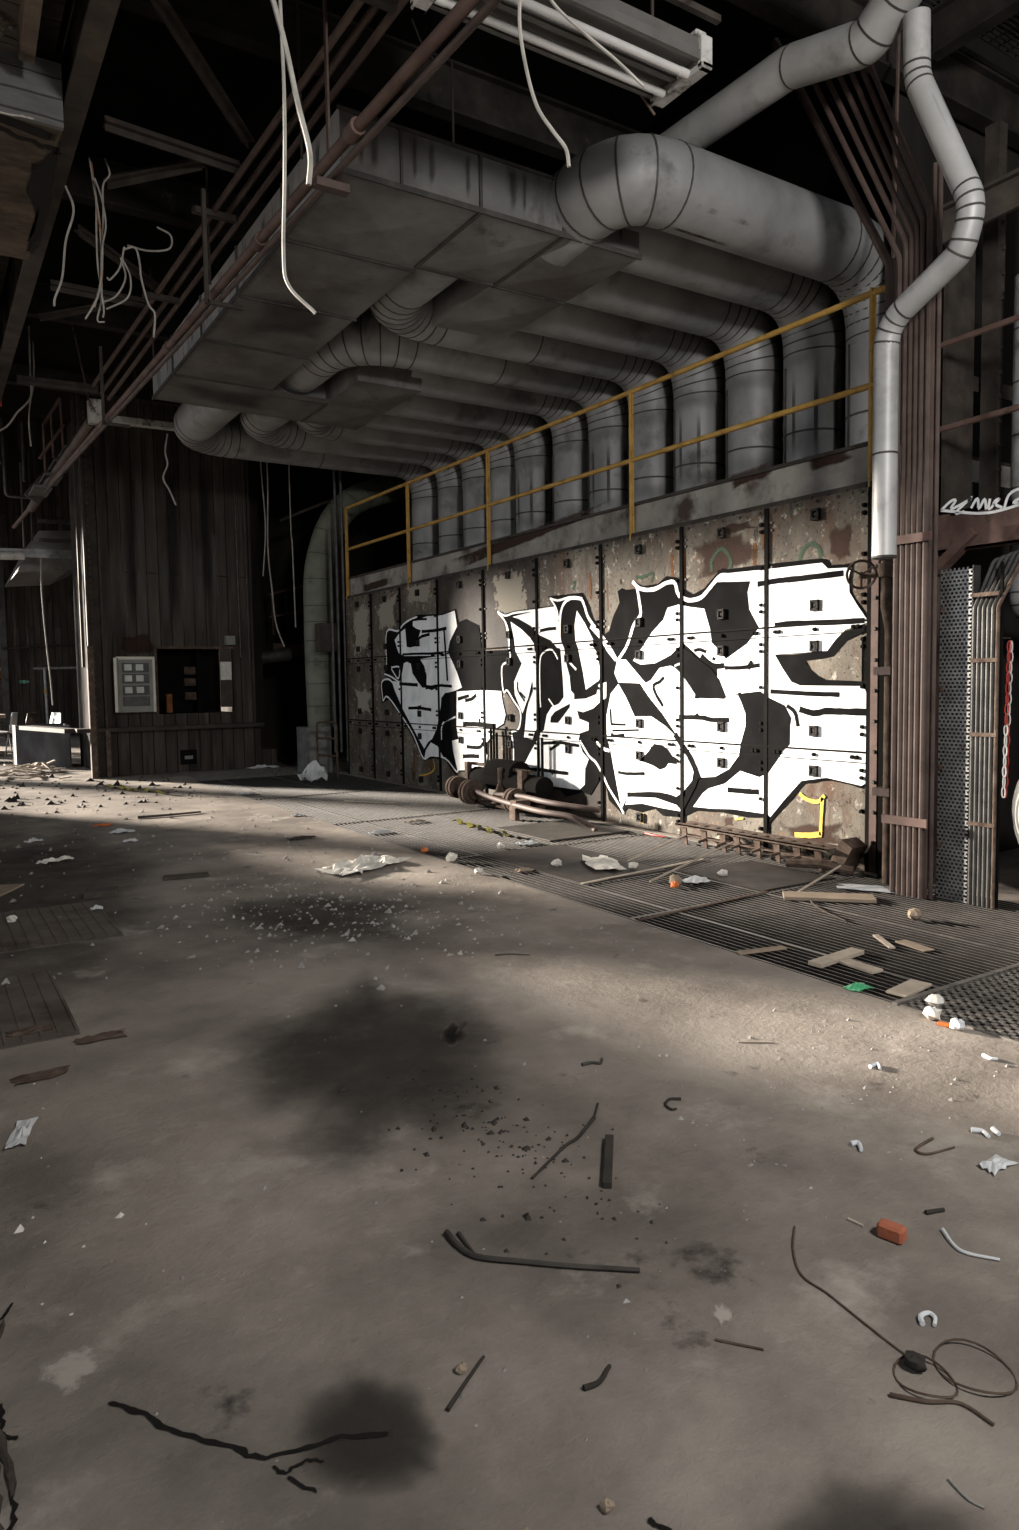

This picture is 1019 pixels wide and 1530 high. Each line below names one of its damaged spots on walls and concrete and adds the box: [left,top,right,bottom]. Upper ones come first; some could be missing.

crack [0,1303,13,1339]
crack [0,1403,19,1530]
crack [108,1401,388,1493]
crack [648,1517,672,1530]